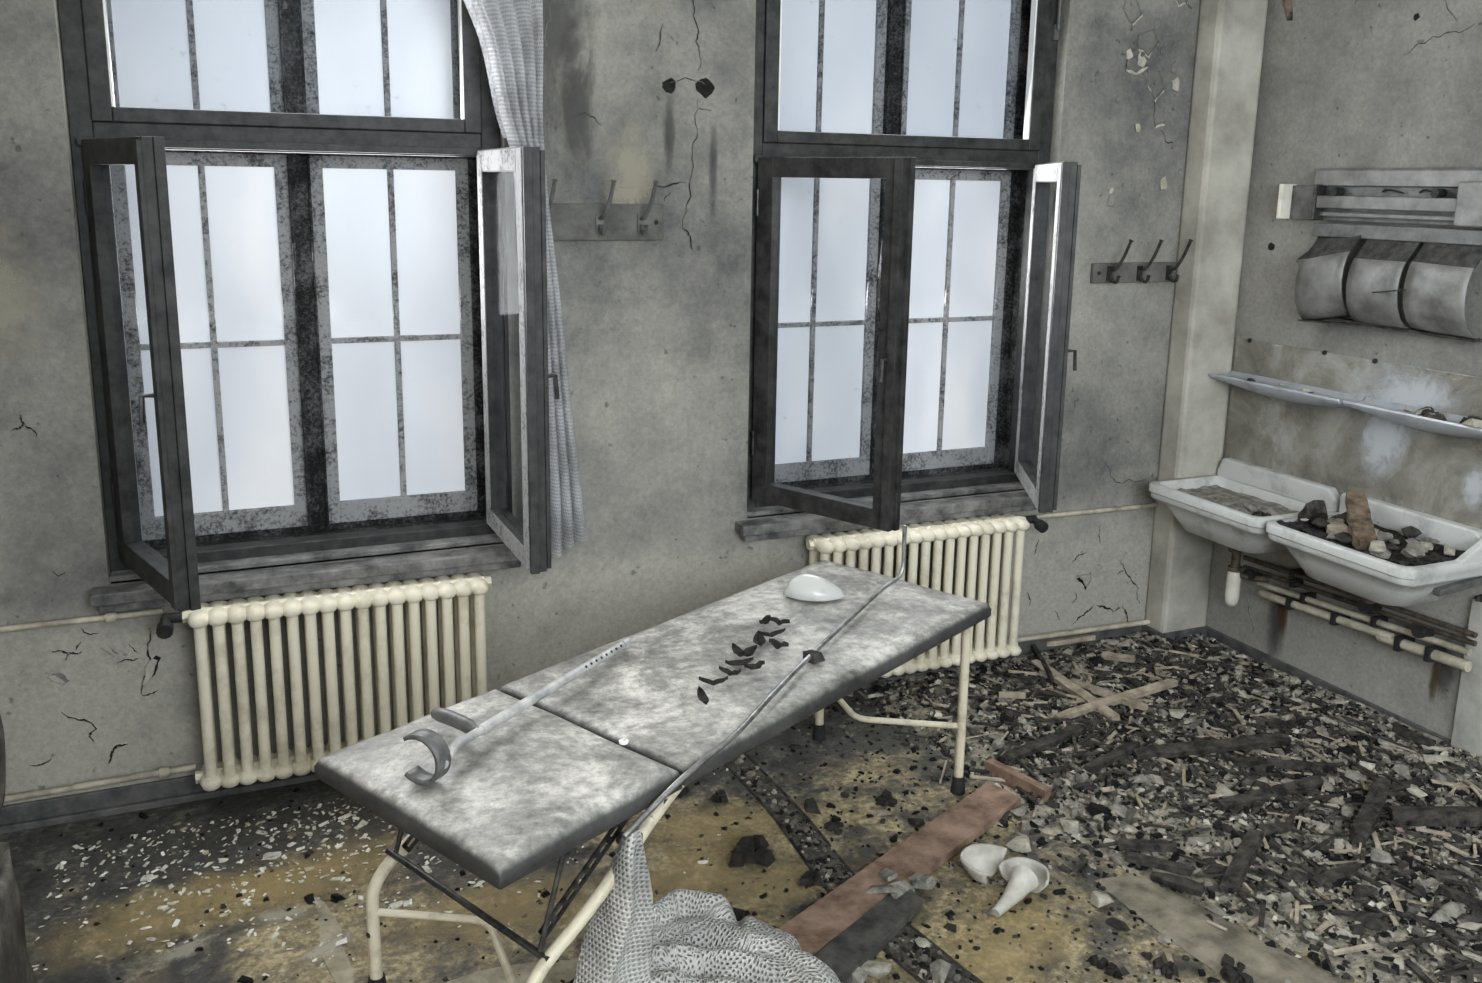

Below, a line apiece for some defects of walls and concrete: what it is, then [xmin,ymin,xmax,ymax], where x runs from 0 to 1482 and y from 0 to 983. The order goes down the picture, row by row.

crack [1404,0,1475,55]
crack [615,0,711,251]
crack [52,628,158,696]
crack [61,711,127,764]